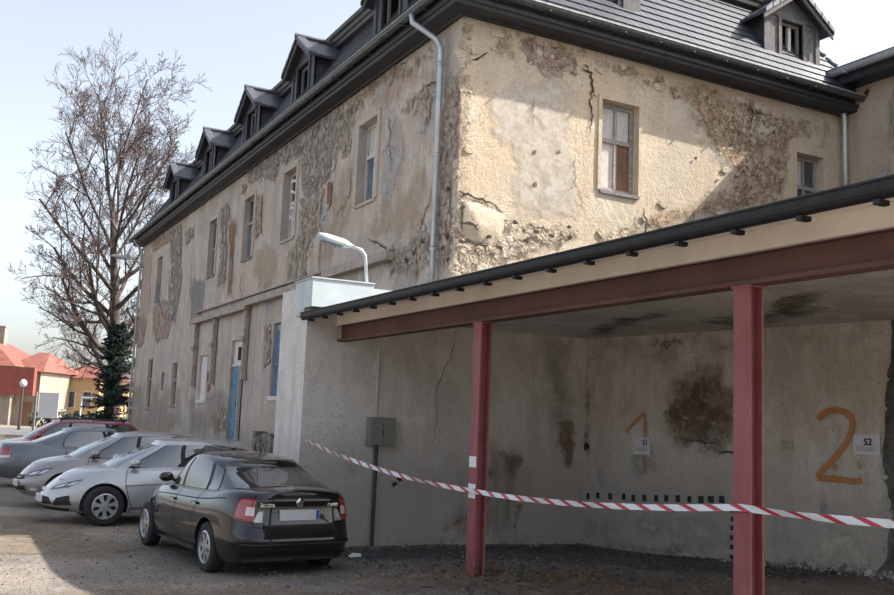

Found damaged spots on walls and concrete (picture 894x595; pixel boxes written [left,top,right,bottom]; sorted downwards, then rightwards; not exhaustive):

flaking render [490,28,578,80]
crack [580,64,597,133]
spalling [287,47,431,284]
spalling [388,16,479,281]
spalling [594,58,811,228]
crack [419,190,502,253]
spalling [136,225,194,349]
water stain [559,421,574,465]
crack [691,439,733,454]